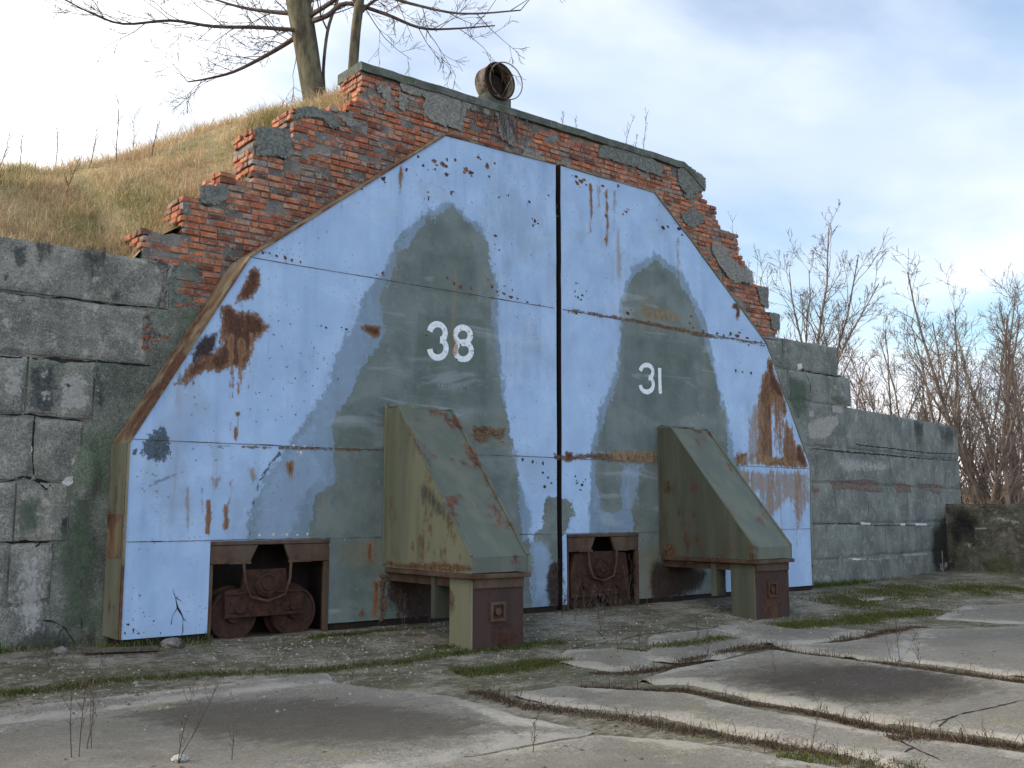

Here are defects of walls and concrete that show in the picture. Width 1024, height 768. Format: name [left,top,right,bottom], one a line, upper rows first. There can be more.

flaking render [255,106,359,160]
flaking render [598,145,663,177]
flaking render [199,184,231,207]
rust [589,183,615,246]
flaking render [661,166,706,236]
flaking render [141,256,200,351]
rust [174,266,269,393]
flaking render [712,242,780,331]
rust [472,425,505,443]
rust [554,309,809,528]
rust [205,499,229,535]
crack [171,591,186,637]